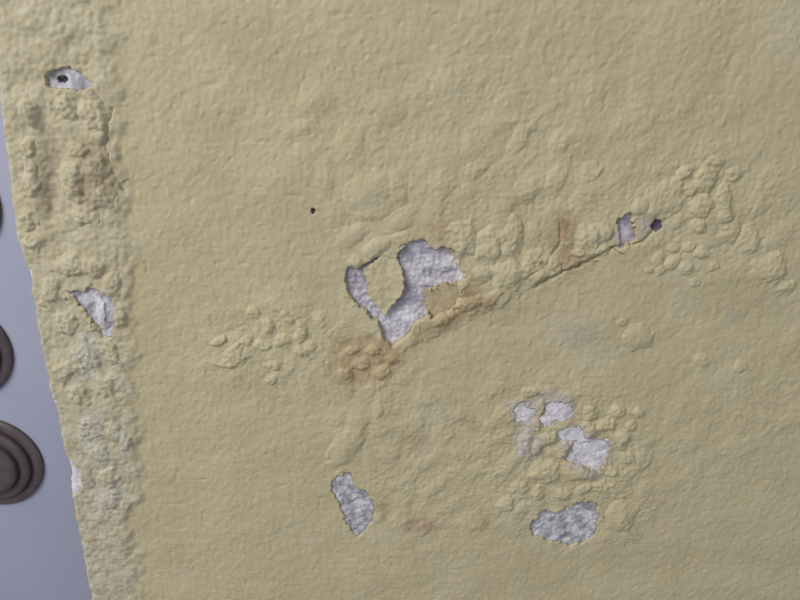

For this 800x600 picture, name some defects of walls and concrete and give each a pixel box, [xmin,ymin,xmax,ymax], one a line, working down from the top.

peeling [47,66,93,91]
peeling [617,213,635,247]
crack [538,233,650,284]
peeling [71,288,115,337]
peeling [342,239,469,344]
peeling [513,401,610,471]
peeling [331,468,375,536]
peeling [531,497,600,545]